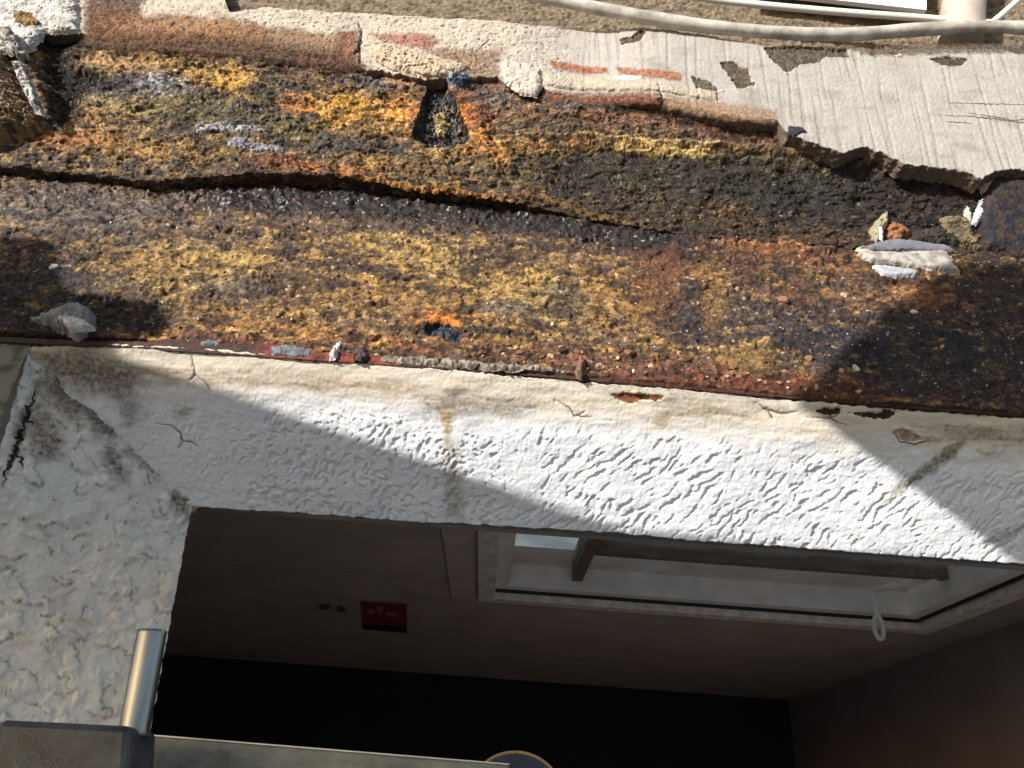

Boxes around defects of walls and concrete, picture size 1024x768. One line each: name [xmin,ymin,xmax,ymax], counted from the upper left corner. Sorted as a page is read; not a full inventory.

corrosion [551,61,681,81]
spalling [691,61,755,93]
spalling [764,45,849,75]
hole [411,83,471,148]
corrosion [195,120,285,153]
corrosion [614,135,711,160]
corrosion [334,160,646,227]
crack [190,357,211,391]
peeling [613,390,664,403]
crack [2,386,36,488]
crack [161,424,200,449]
leakage [897,425,1024,487]